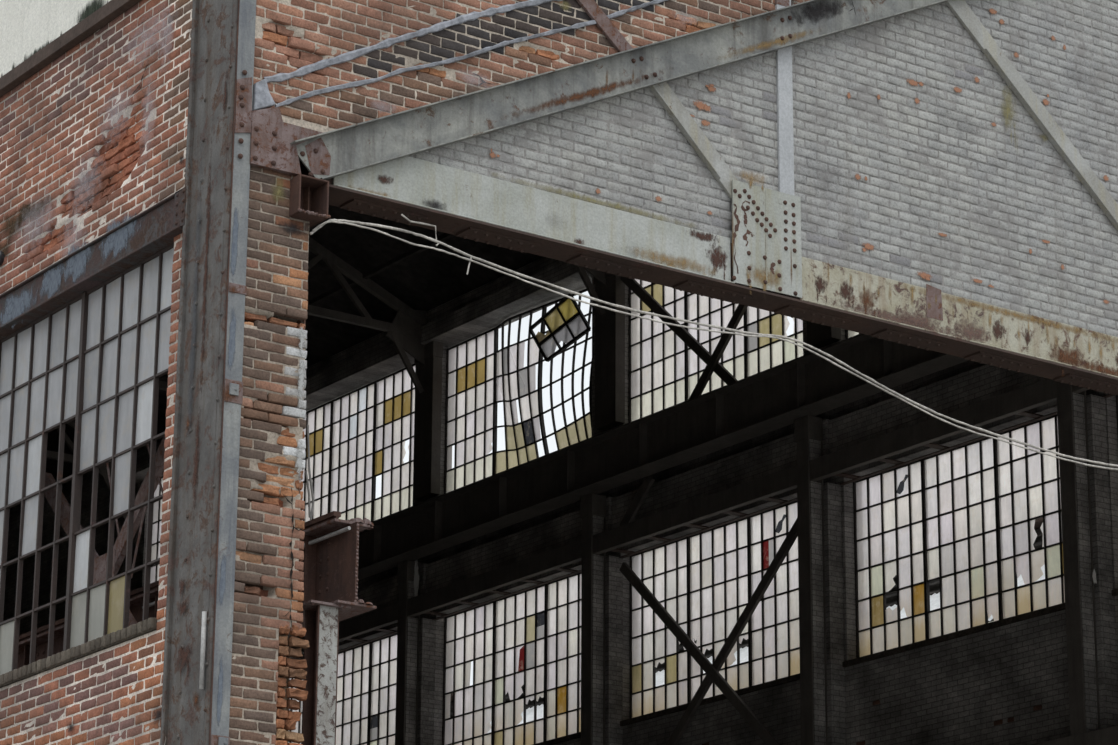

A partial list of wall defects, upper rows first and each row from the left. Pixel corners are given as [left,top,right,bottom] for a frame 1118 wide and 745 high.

spalling [0,103,150,328]
corrosion [643,201,792,291]
peeling [244,312,306,408]
corrosion [815,267,1118,376]
spalling [250,427,305,508]
spalling [275,625,310,745]